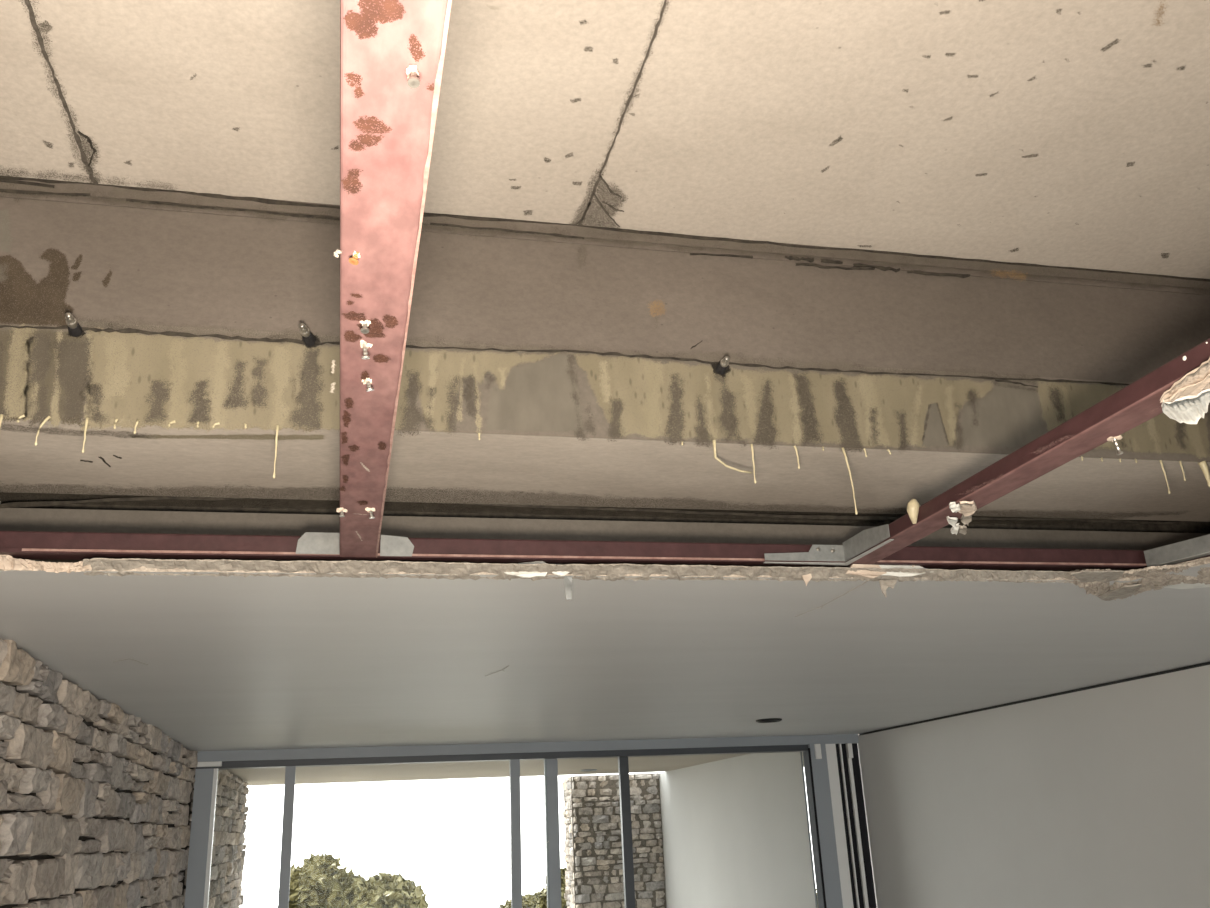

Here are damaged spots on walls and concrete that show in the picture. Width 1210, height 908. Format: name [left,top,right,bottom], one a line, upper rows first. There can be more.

rust [343,0,406,40]
rust [409,34,426,62]
rust [344,71,365,99]
crack [0,0,340,228]
rust [348,116,392,152]
crack [421,0,1210,294]
rust [342,294,398,343]
water stain [0,248,340,510]
water stain [1036,381,1124,432]
water stain [384,349,994,522]
water stain [1081,405,1210,494]
flaking render [0,555,1210,601]